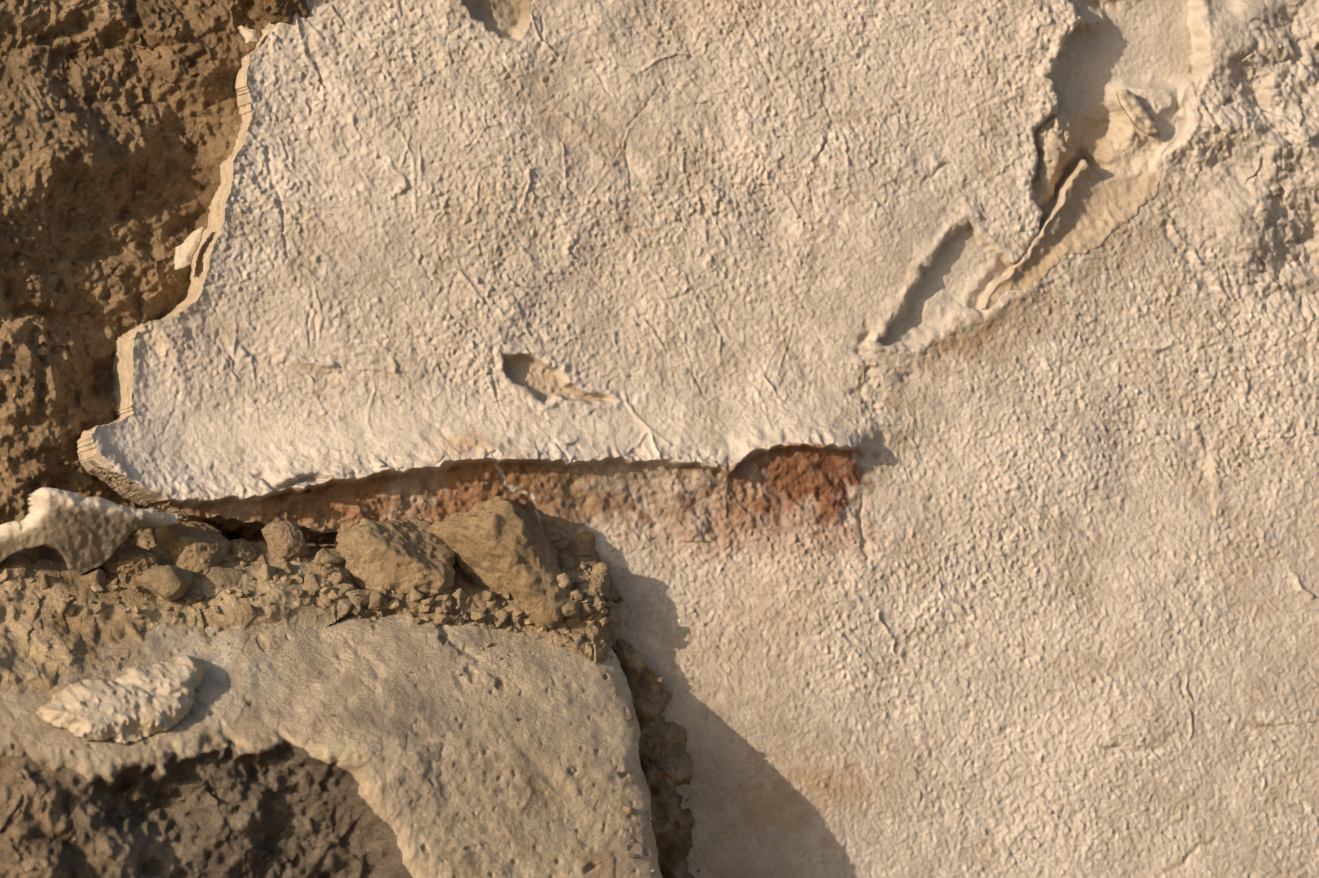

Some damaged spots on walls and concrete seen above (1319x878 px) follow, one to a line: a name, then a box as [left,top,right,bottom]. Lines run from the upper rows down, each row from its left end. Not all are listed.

spalling [76,21,280,530]
spalling [878,0,1319,349]
spalling [299,525,338,535]